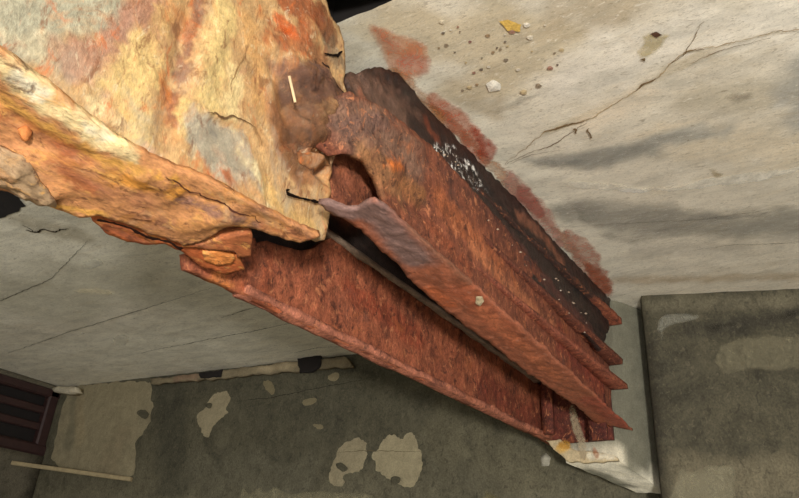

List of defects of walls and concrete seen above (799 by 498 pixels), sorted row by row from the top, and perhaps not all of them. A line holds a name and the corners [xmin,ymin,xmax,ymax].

crack [505,23,799,164]
crack [208,112,262,144]
corrosion [374,28,612,294]
crack [167,178,261,223]
peeling [51,381,154,477]
peeling [197,391,231,437]
peeling [328,432,423,498]